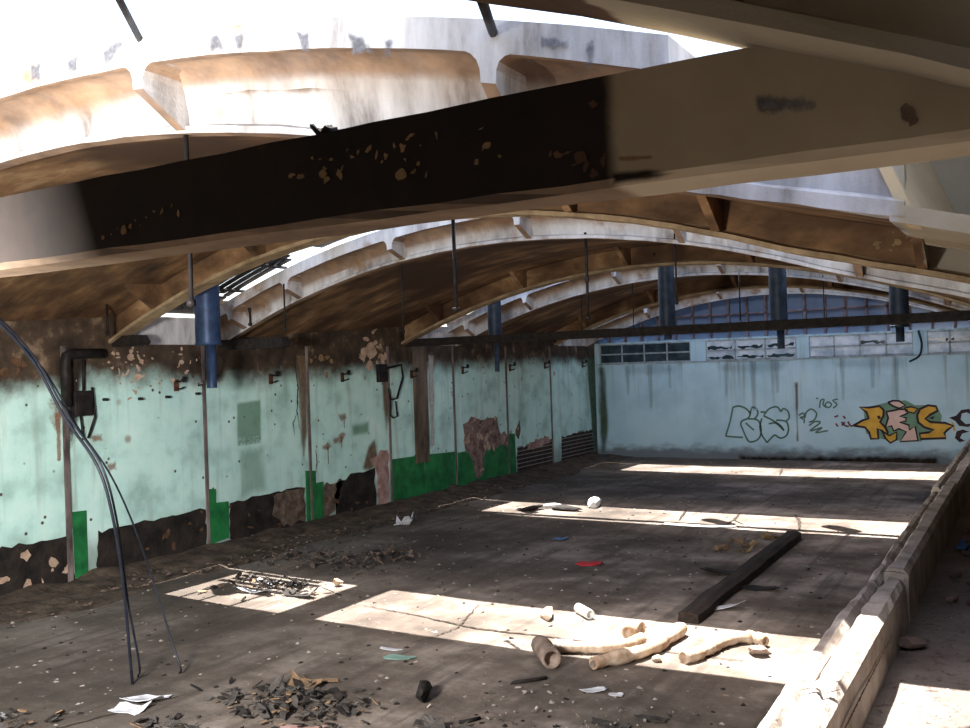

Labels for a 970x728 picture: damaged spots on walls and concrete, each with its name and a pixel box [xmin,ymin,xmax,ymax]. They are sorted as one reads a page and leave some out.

damp [757,97,813,112]
peeling [311,133,428,184]
peeling [359,329,387,371]
flaking render [463,416,594,478]
flaking render [0,536,75,596]
flaking render [96,508,207,568]
flaking render [229,487,306,540]
flaking render [324,450,389,517]